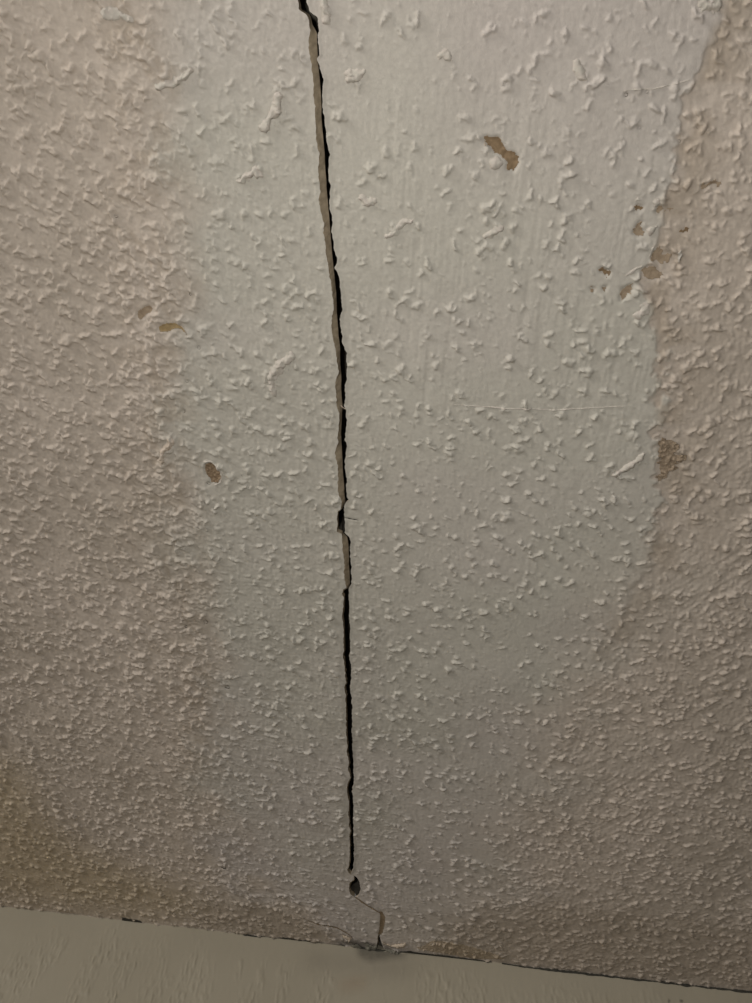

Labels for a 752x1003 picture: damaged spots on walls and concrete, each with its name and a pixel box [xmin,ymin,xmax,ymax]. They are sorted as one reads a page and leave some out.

crack [298,0,357,873]
crack [243,897,752,993]